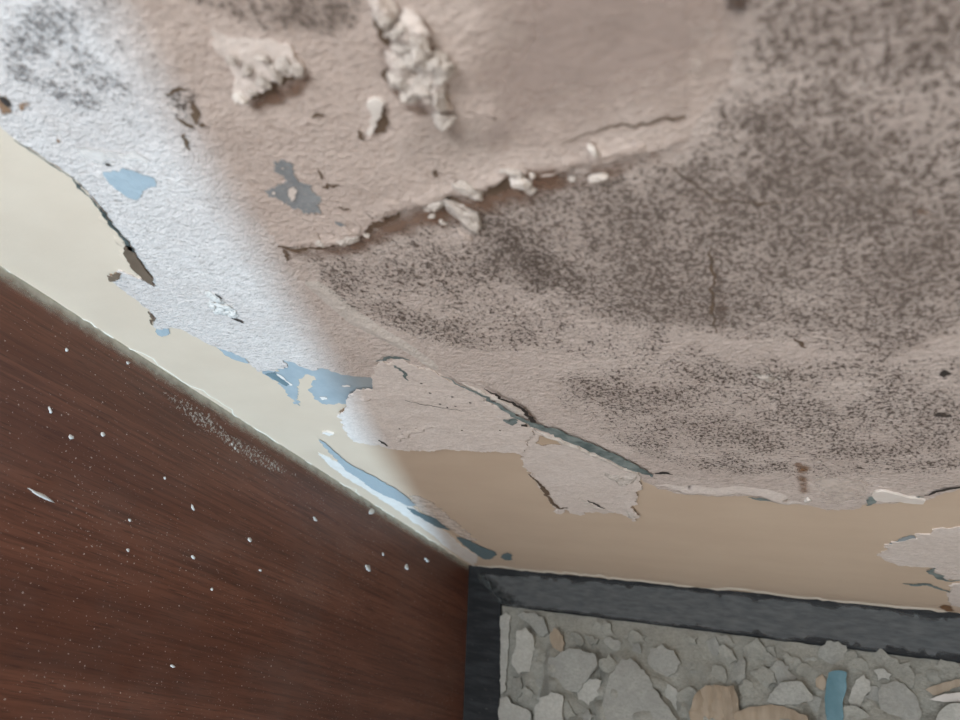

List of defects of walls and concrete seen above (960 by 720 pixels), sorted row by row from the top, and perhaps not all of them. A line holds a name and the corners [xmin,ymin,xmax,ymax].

spalling [0,97,26,114]
spalling [161,87,206,151]
flaking render [210,29,309,108]
flaking render [357,96,389,141]
spalling [369,0,457,132]
leakage [305,0,960,476]
peeling [0,116,960,612]